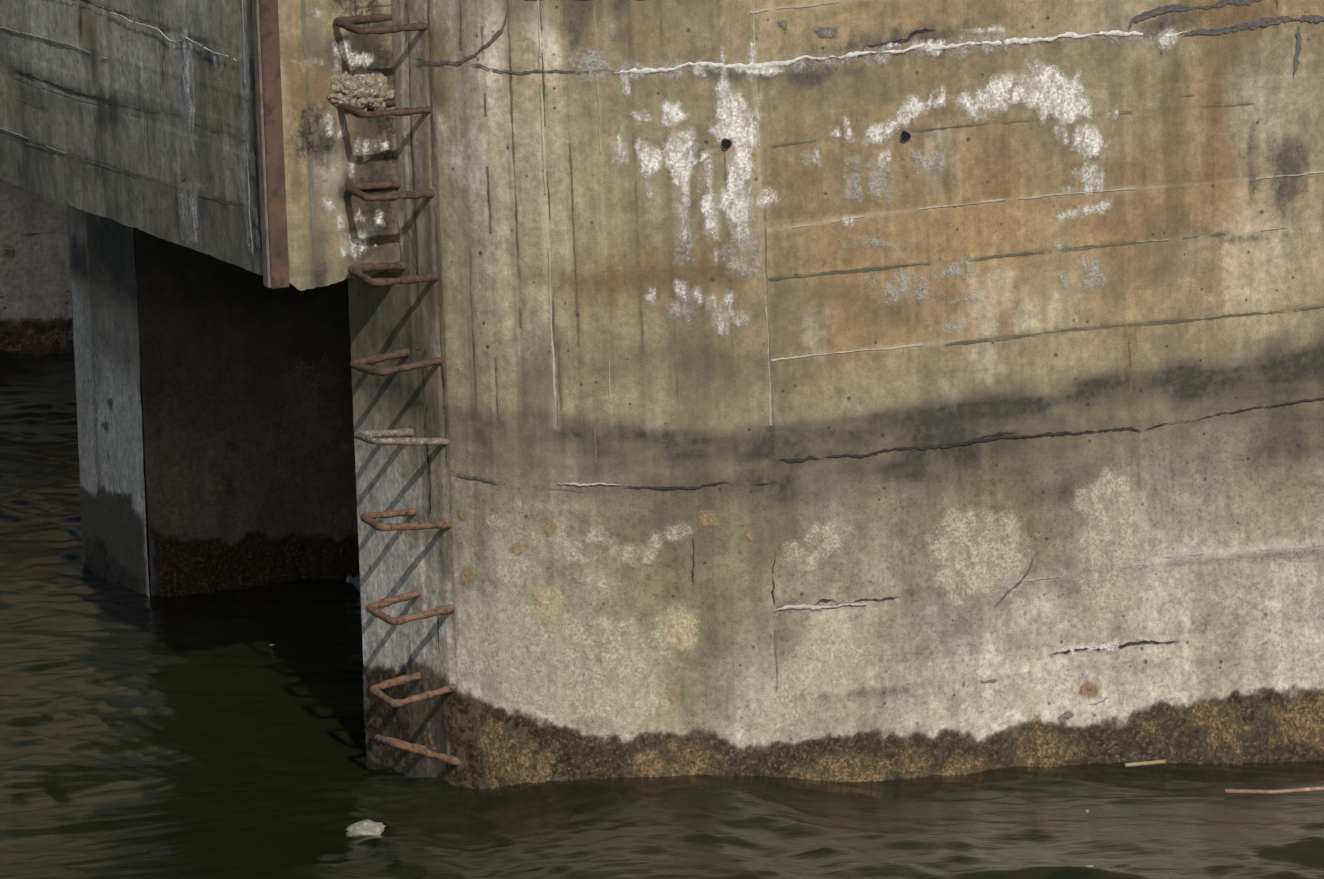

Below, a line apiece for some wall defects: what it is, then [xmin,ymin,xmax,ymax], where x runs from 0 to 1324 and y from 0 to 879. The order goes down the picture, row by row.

crack [15,0,237,179]
damp [299,107,340,164]
damp [333,0,393,76]
damp [341,92,405,261]
crack [409,132,417,275]
damp [615,67,774,275]
crack [405,0,1324,94]
damp [834,65,1110,219]
damp [670,281,744,331]
crack [425,362,504,516]
crack [559,398,1324,490]
crack [771,555,901,611]